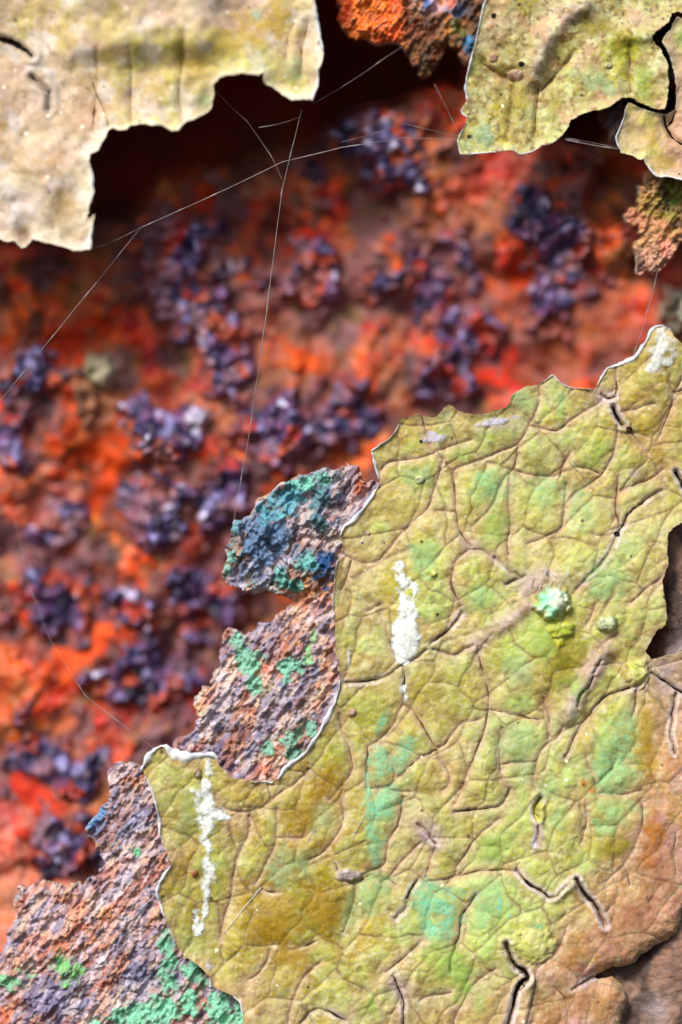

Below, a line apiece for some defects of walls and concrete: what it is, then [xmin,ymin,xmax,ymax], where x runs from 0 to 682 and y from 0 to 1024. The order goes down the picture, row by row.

peeling [0,0,324,251]
peeling [457,0,682,181]
corrosion [181,179,217,216]
peeling [73,351,121,432]
corrosion [48,406,149,511]
corrosion [38,622,157,686]
peeling [87,286,682,1024]
damp [391,561,422,666]
crack [219,379,682,1024]
corrosion [9,773,70,817]
damp [190,759,231,936]
peeling [50,957,85,989]